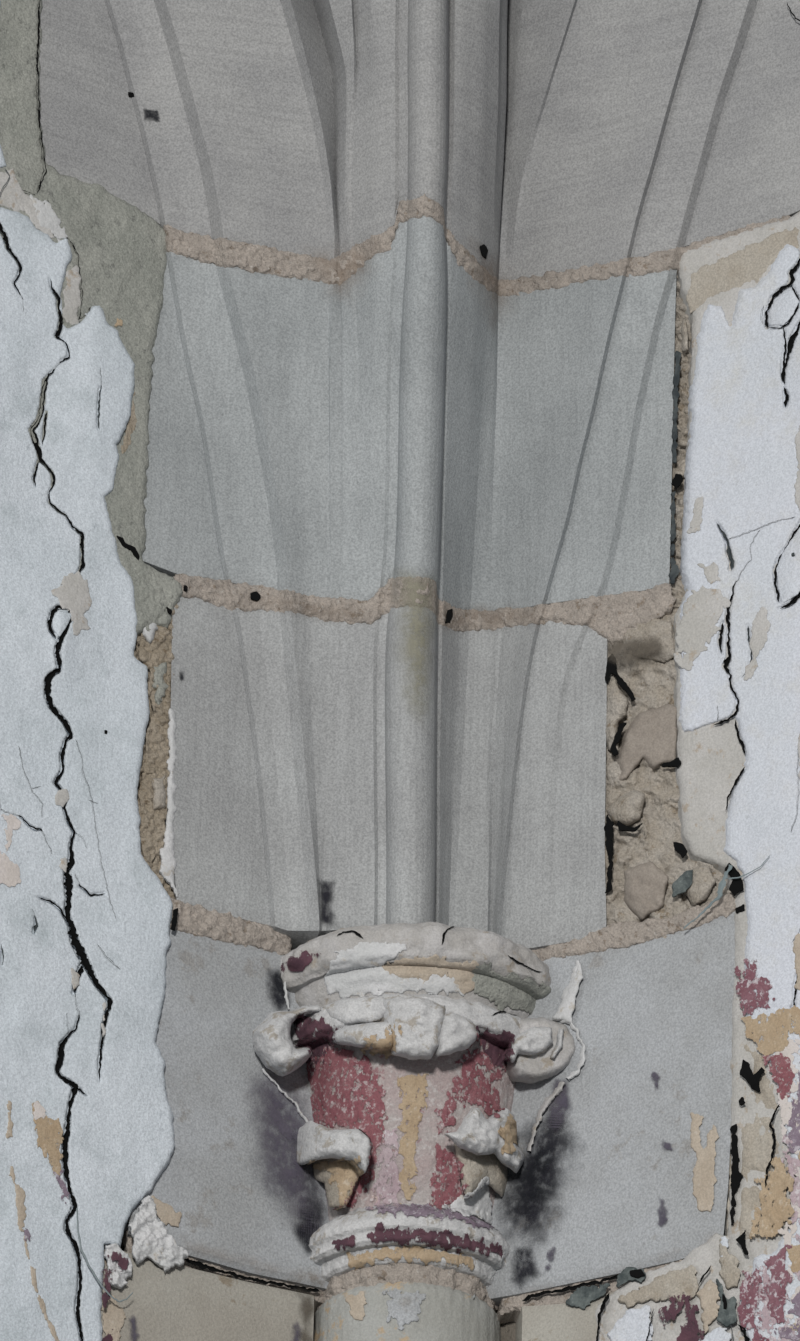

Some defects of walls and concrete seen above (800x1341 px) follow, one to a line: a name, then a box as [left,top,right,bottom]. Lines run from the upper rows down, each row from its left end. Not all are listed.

crack [0,1,90,572]
crack [95,369,103,427]
crack [760,258,800,406]
spalling [138,609,179,898]
spalling [605,227,799,927]
crack [714,517,800,811]
crack [1,606,121,1341]
peeling [280,941,551,1014]
peeling [293,1013,518,1270]
damp [514,1247,555,1284]
damp [509,1080,569,1236]
spalling [595,933,800,1341]